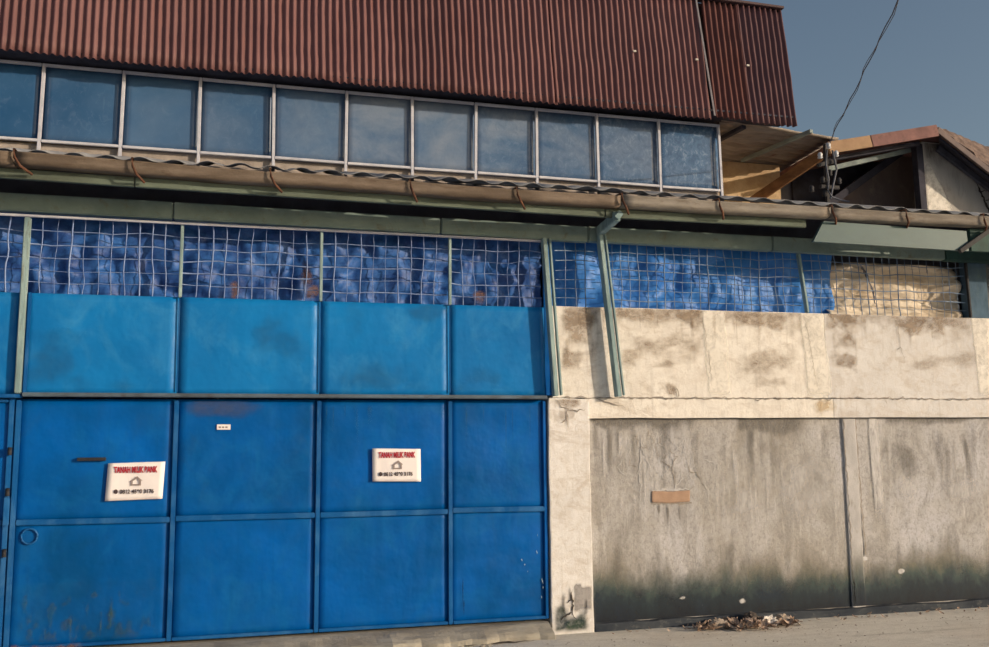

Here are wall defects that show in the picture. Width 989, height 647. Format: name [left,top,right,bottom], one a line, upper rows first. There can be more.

leakage [667,310,701,327]
leakage [830,314,856,340]
leakage [898,316,959,334]
leakage [739,419,797,432]
leakage [594,419,718,514]
leakage [869,418,883,509]
leakage [586,551,989,622]